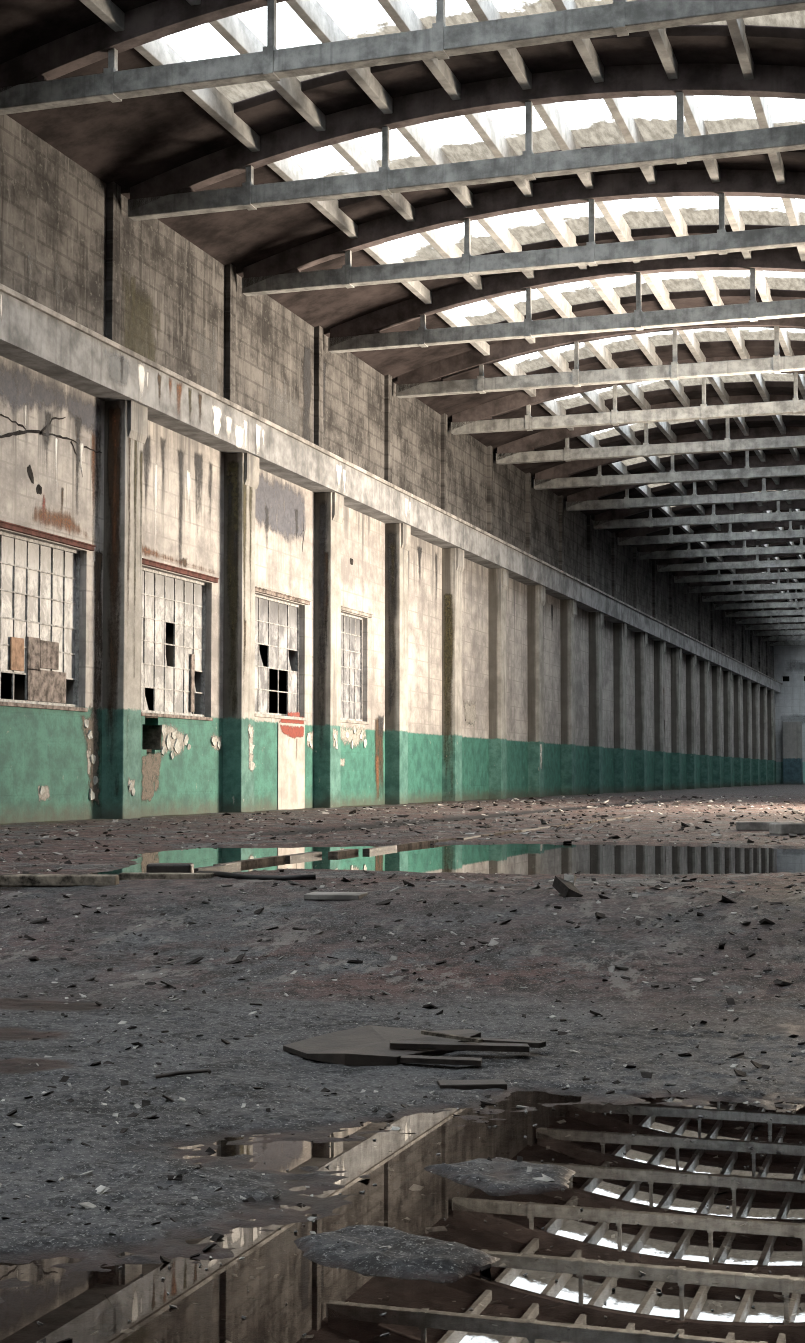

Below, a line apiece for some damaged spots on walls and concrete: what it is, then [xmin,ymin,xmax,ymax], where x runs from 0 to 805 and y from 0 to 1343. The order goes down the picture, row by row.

water stain [108,355,149,391]
water stain [0,363,101,507]
water stain [212,406,264,448]
corrosion [34,405,202,741]
peeling [82,716,100,807]
spalling [128,716,191,802]
peeling [333,725,367,766]